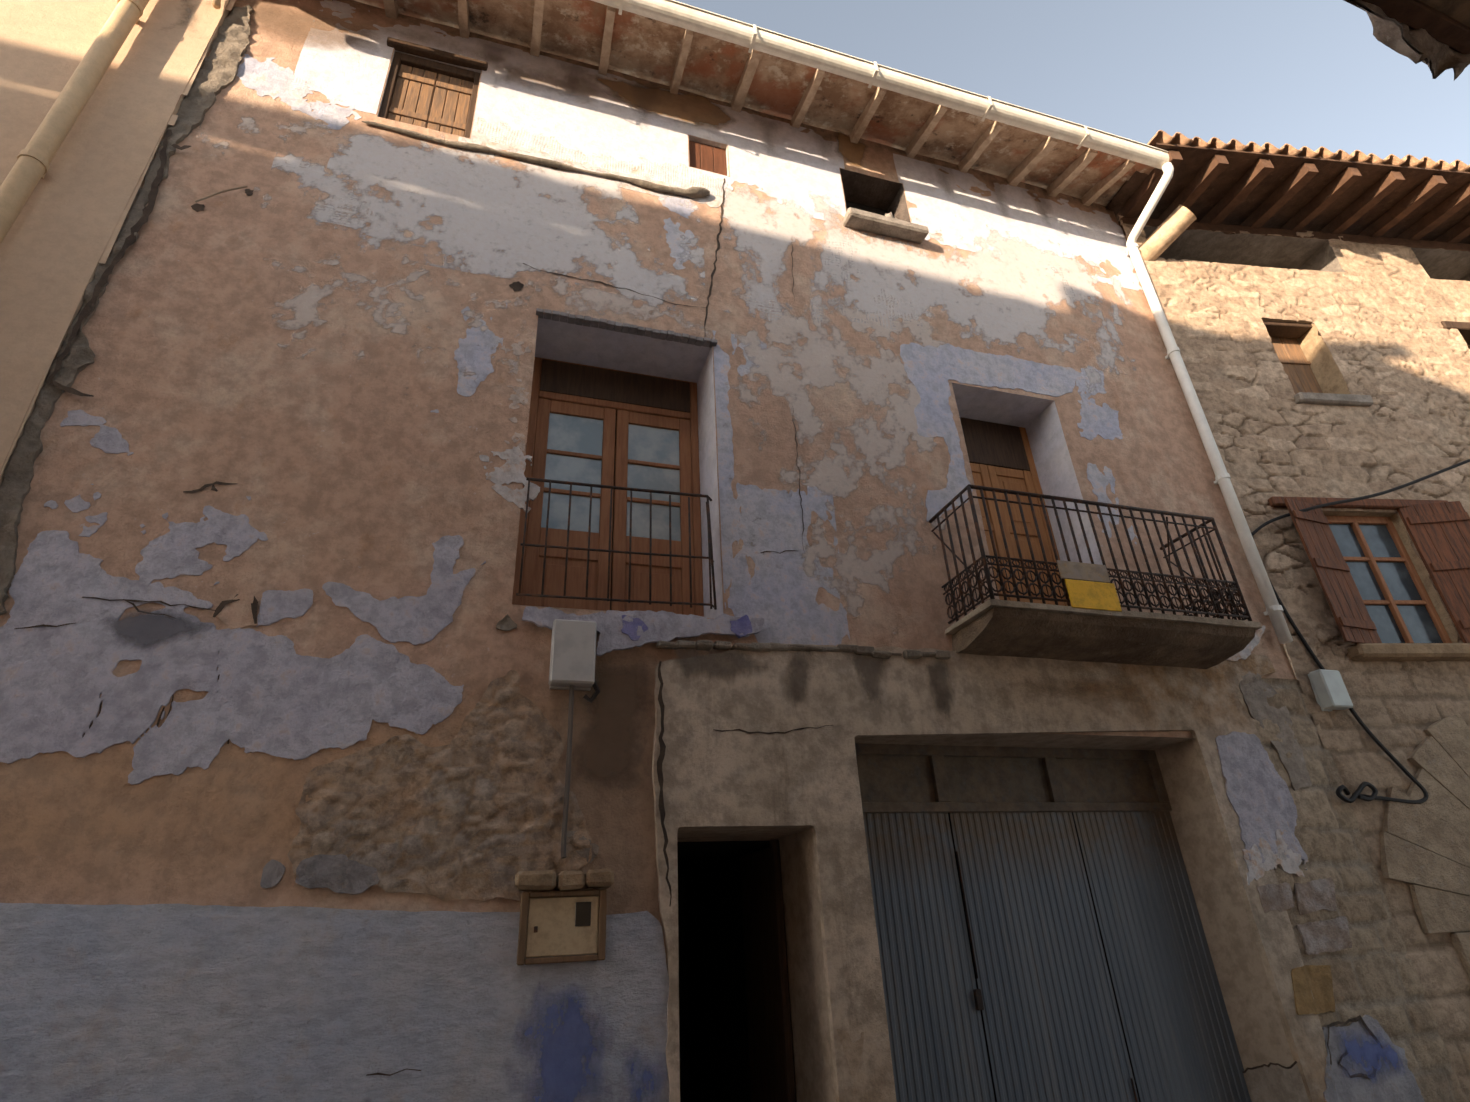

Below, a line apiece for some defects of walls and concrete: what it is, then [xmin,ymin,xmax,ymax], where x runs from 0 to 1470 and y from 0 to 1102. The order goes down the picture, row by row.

crack [523,178,725,337]
peeling [0,0,1143,785]
crack [14,594,258,629]
crack [156,694,174,727]
crack [657,661,672,907]
peeling [1216,731,1425,1102]
water stain [522,992,602,1102]